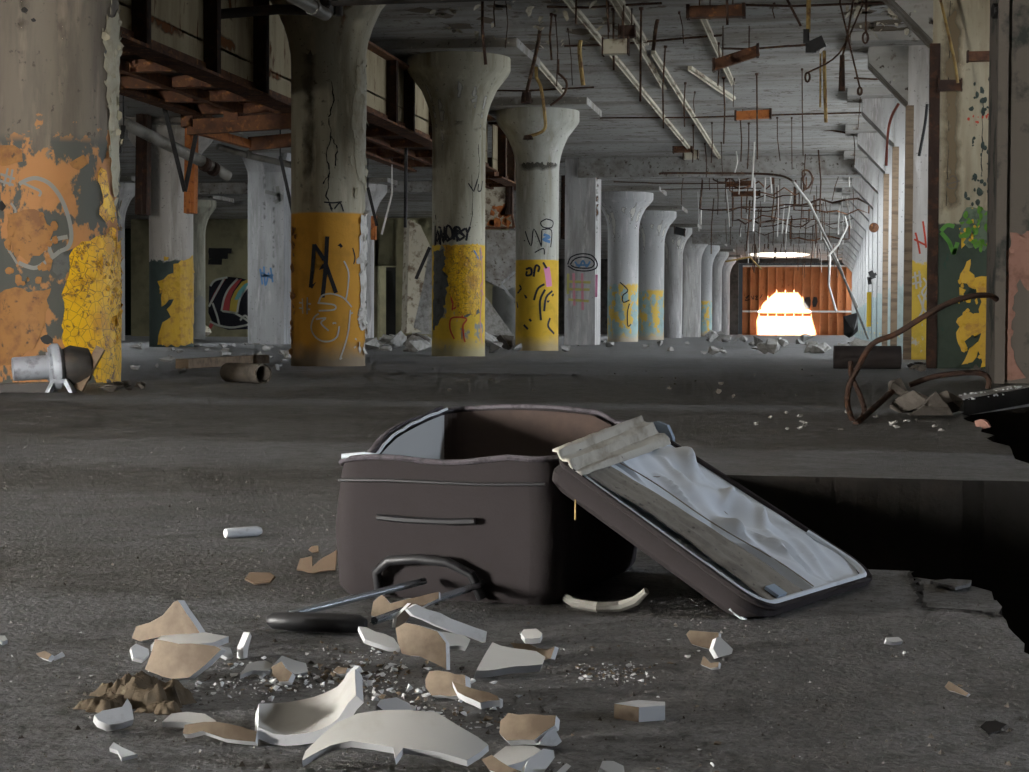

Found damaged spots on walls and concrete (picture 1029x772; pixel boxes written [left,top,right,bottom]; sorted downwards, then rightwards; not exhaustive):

peeling [0,0,124,383]
crack [323,81,338,211]
peeling [967,78,989,165]
peeling [157,255,195,347]
spalling [208,248,232,265]
peeling [433,243,481,330]
peeling [844,173,1029,424]
spalling [980,720,1006,734]